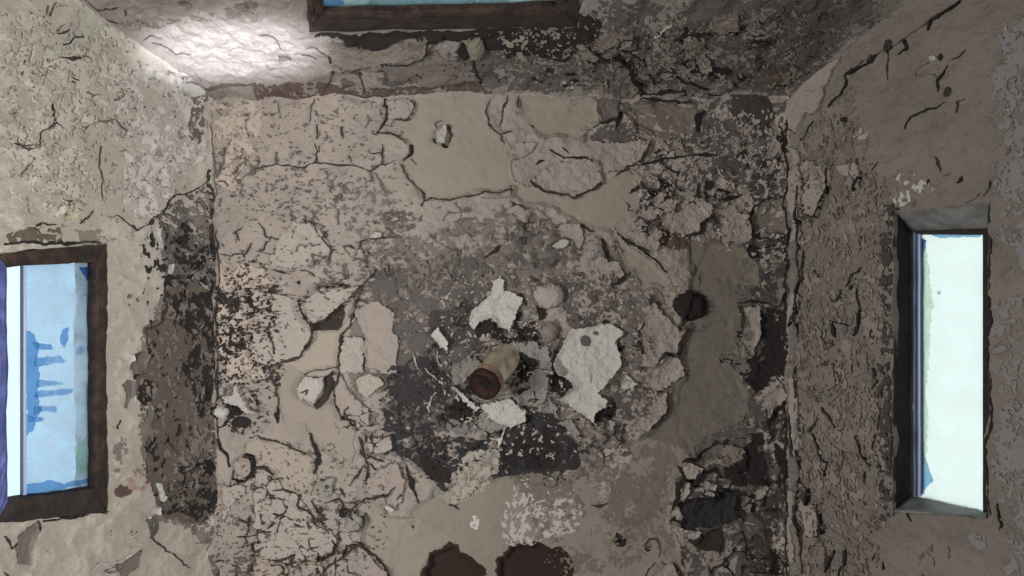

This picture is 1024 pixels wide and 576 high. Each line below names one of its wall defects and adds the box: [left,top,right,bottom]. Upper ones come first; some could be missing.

crack [14,36,129,176]
crack [904,50,966,129]
crack [927,1,961,31]
water stain [0,12,280,576]
corrosion [468,368,501,400]
crack [80,21,909,576]
water stain [432,270,678,576]
spalling [213,0,960,576]
water stain [497,9,936,576]
crack [918,544,935,576]